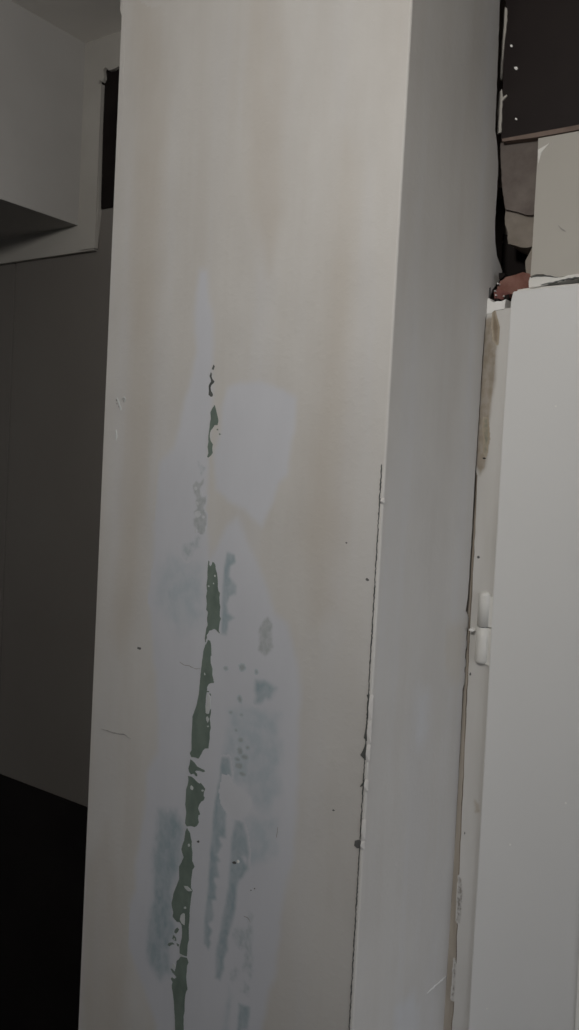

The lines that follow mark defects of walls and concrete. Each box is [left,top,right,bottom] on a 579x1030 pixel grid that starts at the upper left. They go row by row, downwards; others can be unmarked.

peeling [207,405,221,458]
peeling [168,560,259,1030]